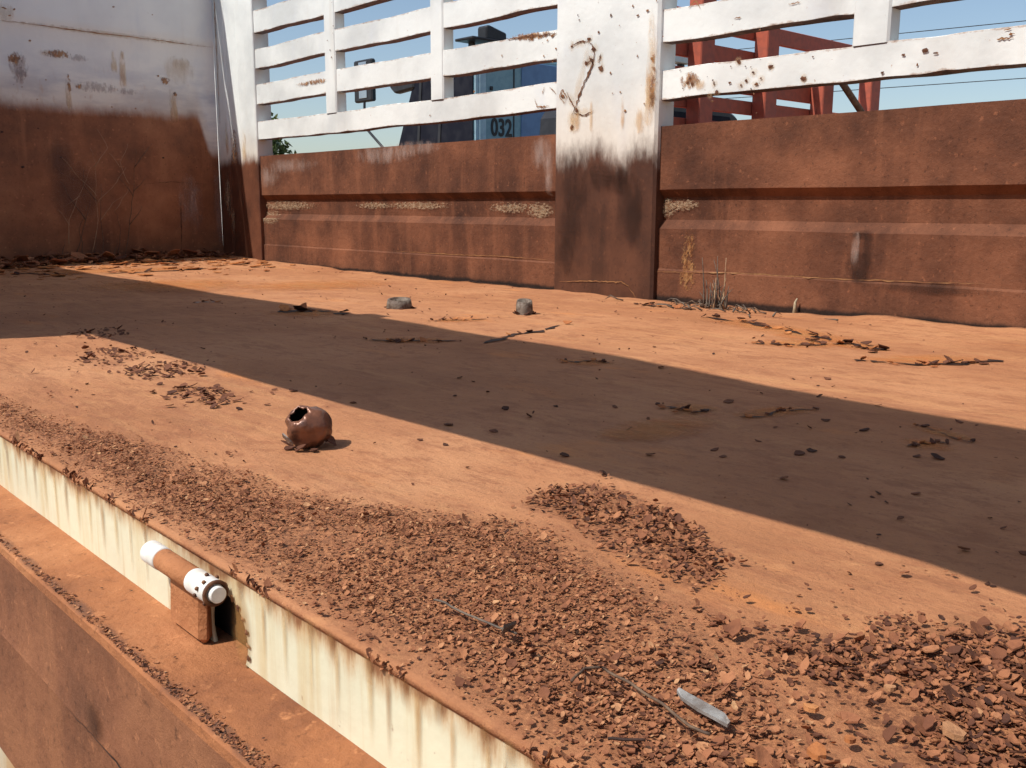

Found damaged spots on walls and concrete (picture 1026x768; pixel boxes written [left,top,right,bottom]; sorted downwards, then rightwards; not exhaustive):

rust [85,258,204,274]
rust [680,236,695,290]